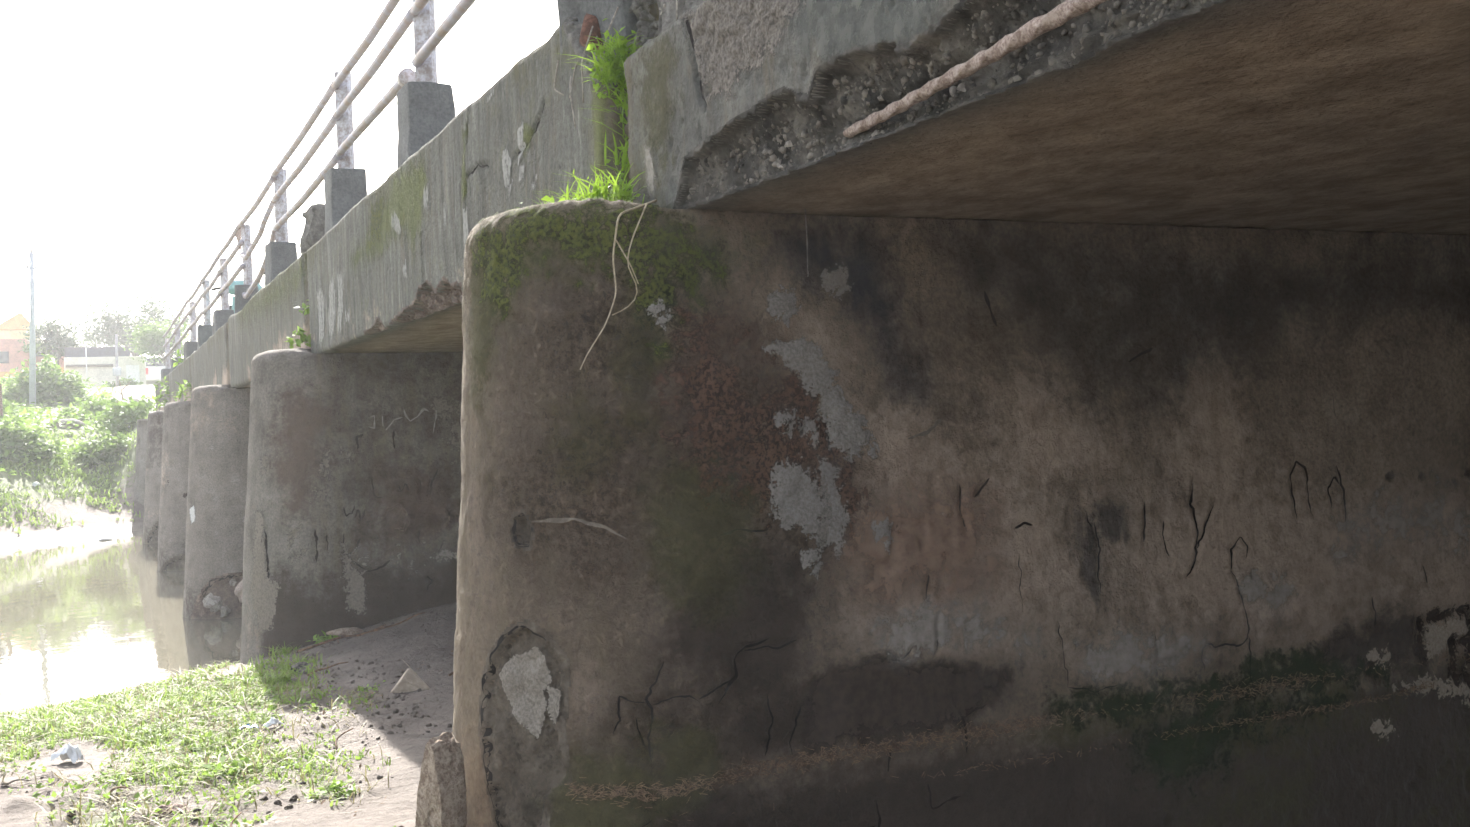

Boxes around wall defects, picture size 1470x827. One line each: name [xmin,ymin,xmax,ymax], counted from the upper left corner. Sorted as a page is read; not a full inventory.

spalling [673,0,1228,209]
flaking render [645,298,674,332]
leakage [775,227,926,397]
flaking render [761,283,880,581]
spalling [191,509,281,638]
flaking render [338,541,369,622]
spalling [415,619,573,827]
crack [613,637,801,762]
leakage [801,598,1031,752]
leakage [1302,615,1428,681]
flaking render [1370,715,1399,741]
flaking render [1366,603,1470,708]